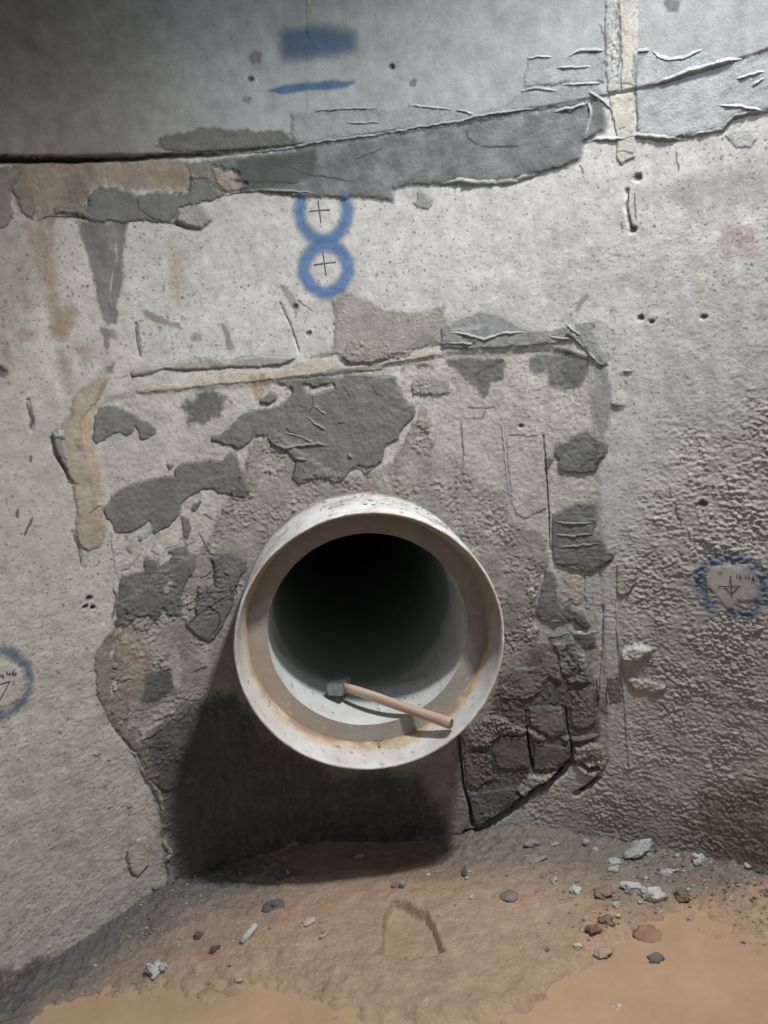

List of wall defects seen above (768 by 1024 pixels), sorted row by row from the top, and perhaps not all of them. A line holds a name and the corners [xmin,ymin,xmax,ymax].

peeling [718,104,766,112]
peeling [345,108,537,147]
crack [0,153,229,163]
peeling [212,165,351,192]
peeling [13,186,36,219]
peeling [173,204,213,231]
spalling [181,593,193,620]
crack [525,710,533,763]
crack [565,708,573,756]
crack [458,740,472,818]